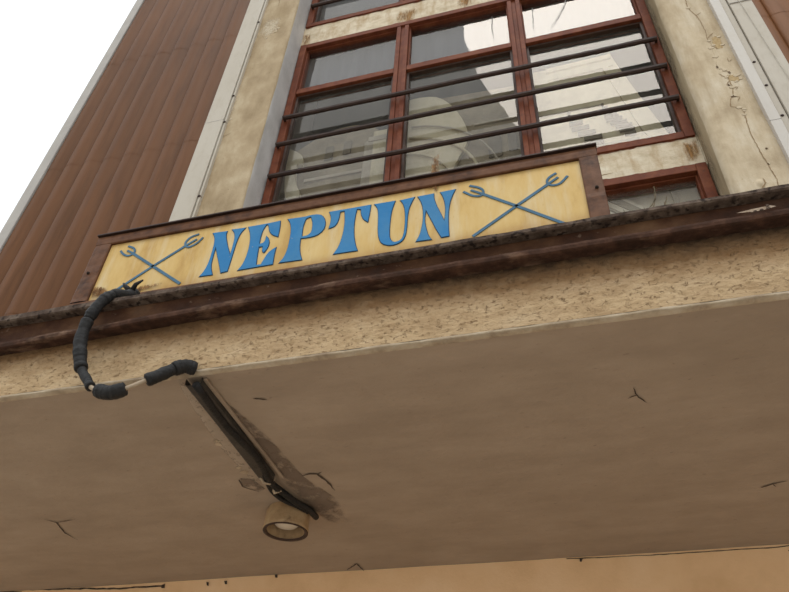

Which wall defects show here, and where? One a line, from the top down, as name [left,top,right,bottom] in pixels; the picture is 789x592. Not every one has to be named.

crack [685,0,779,185]